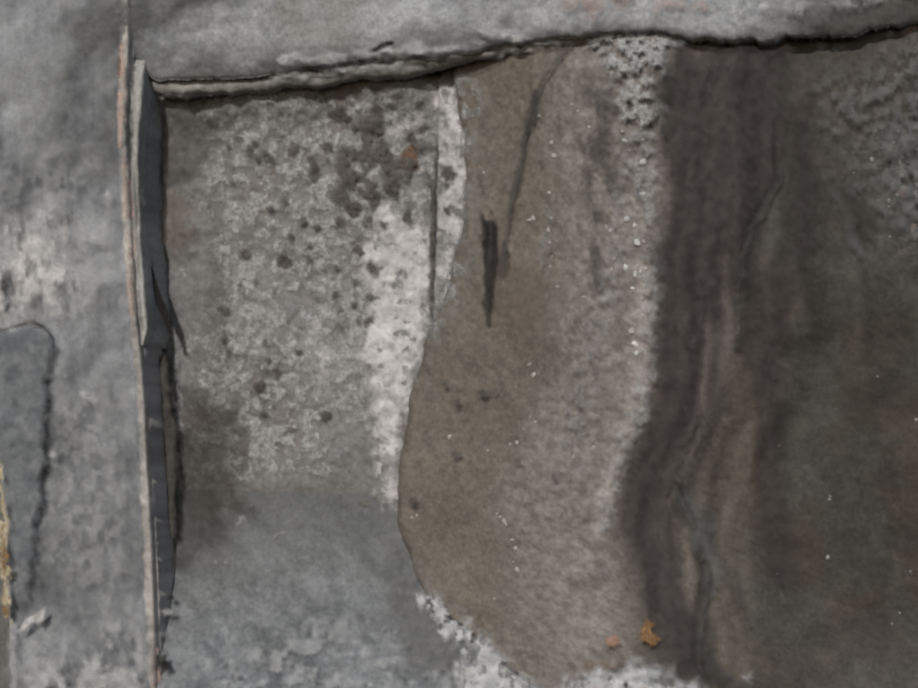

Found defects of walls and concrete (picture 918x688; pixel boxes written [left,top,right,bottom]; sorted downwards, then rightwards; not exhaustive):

leakage [585,26,786,668]
corrosion [0,464,16,688]
leakage [390,572,528,688]